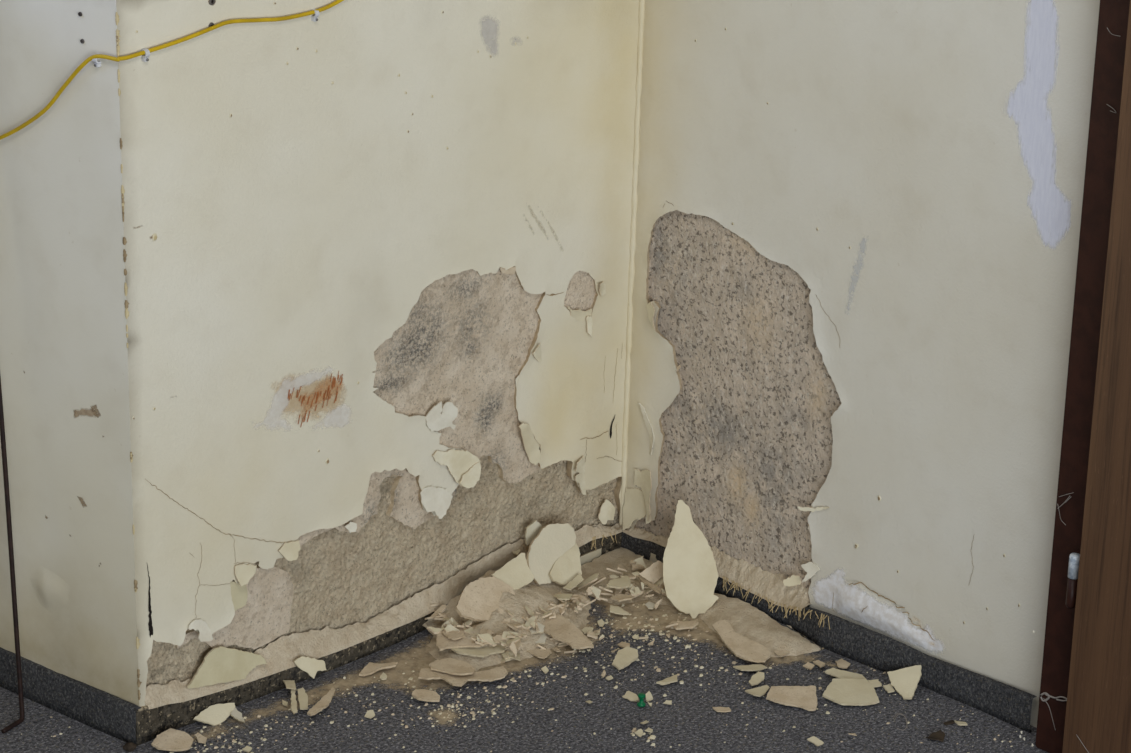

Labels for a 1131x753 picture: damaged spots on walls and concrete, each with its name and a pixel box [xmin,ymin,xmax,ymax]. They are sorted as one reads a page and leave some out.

rust [281,371,343,427]
flaking render [131,210,944,706]
crack [149,482,292,615]
crack [146,565,154,637]
peeling [283,656,326,714]